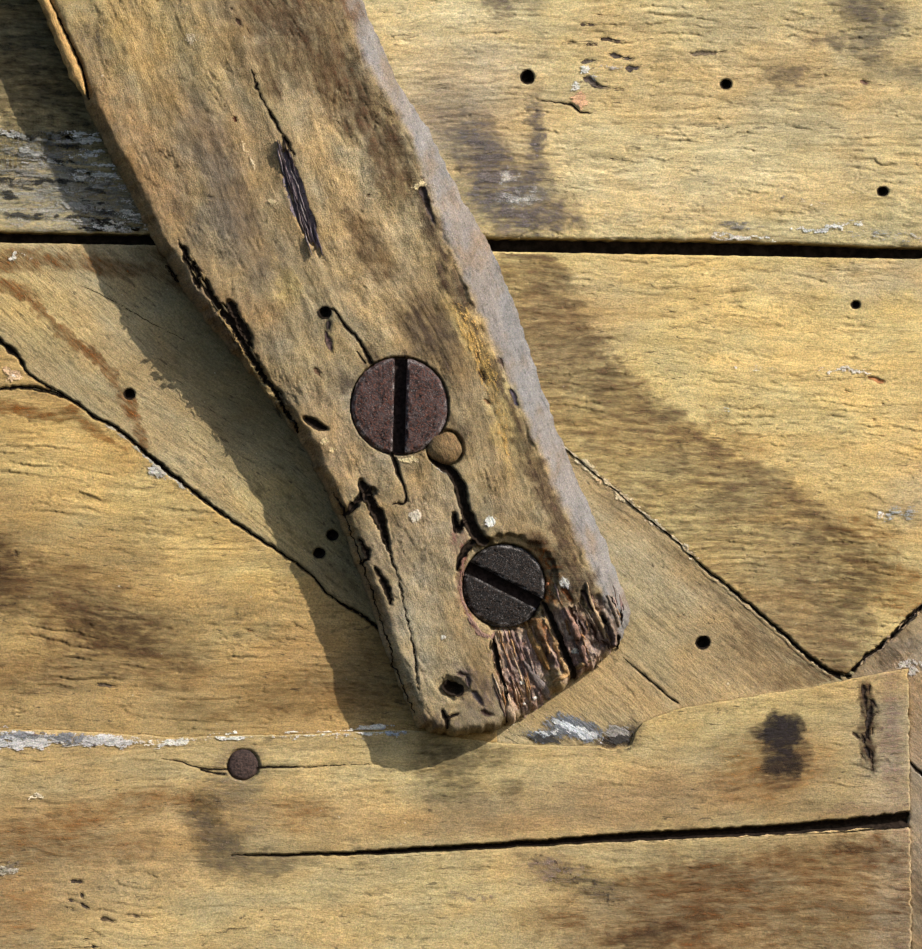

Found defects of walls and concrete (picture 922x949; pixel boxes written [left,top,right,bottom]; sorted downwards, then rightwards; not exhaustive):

crack [251,69,295,157]
crack [165,239,327,433]
crack [0,339,420,713]
leakage [500,252,921,687]
crack [441,710,459,729]
spalling [457,558,624,726]
peeling [525,711,630,746]
crack [231,812,909,856]